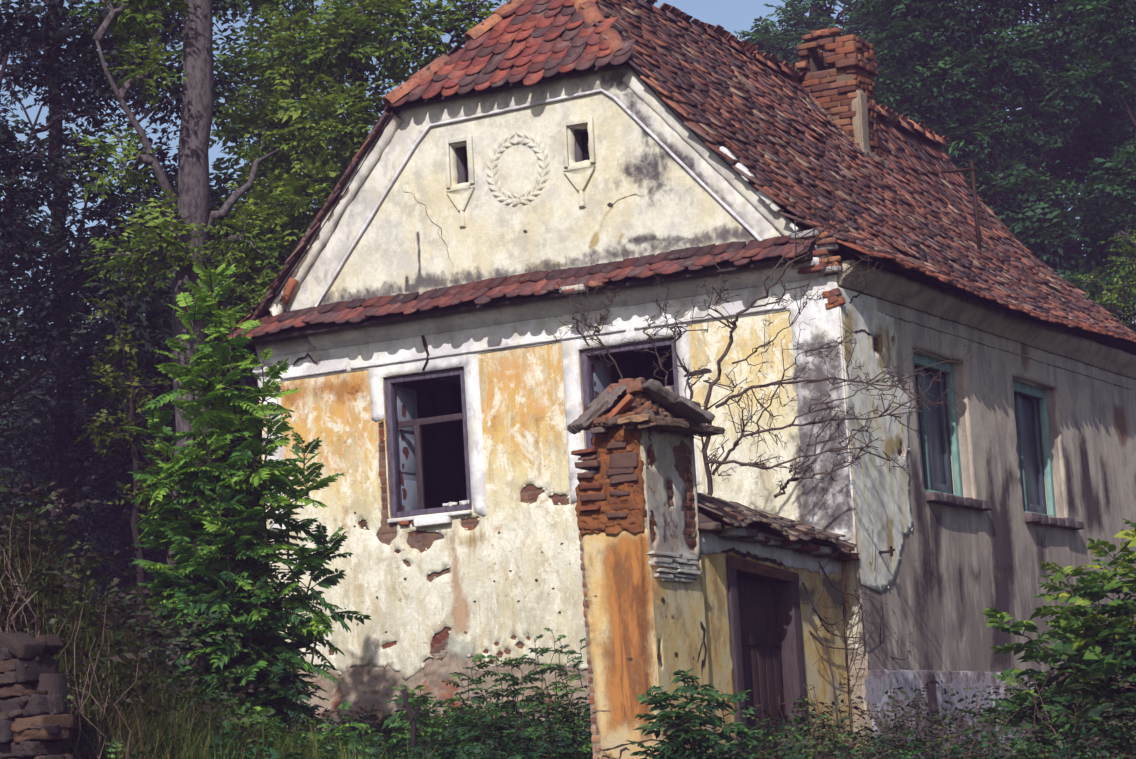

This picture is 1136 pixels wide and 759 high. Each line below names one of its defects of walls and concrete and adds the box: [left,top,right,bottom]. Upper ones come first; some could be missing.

leakage [601,72,731,205]
crack [402,189,450,259]
spalling [789,229,843,275]
crack [266,352,319,392]
spalling [427,566,451,582]
spalling [461,517,480,531]
corrosion [604,535,655,726]
spalling [521,425,841,576]
leakage [793,336,853,531]
peeling [822,287,914,592]
leakage [987,461,1014,670]
leakage [1064,436,1110,532]